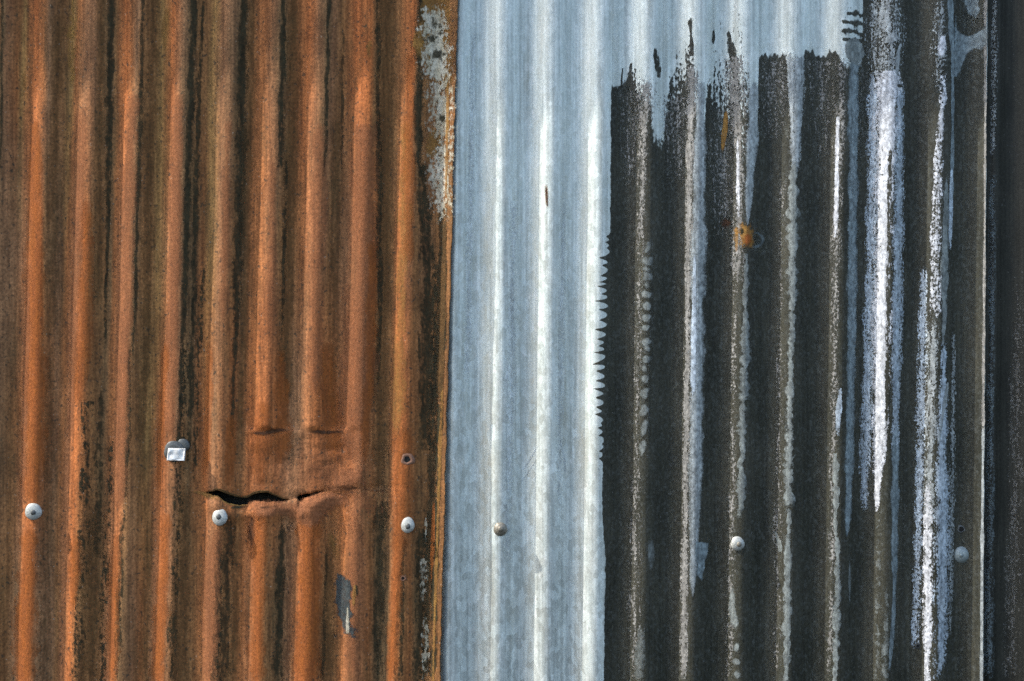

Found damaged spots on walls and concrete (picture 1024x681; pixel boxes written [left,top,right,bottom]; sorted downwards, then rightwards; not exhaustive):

peeling [415,6,454,221]
corrosion [20,123,44,498]
corrosion [116,99,138,502]
corrosion [341,125,376,458]
corrosion [722,220,754,249]
crack [198,491,347,542]
corrosion [430,225,447,680]
corrosion [14,532,36,677]
corrosion [153,518,170,679]
corrosion [295,524,319,680]
peeling [334,573,358,638]